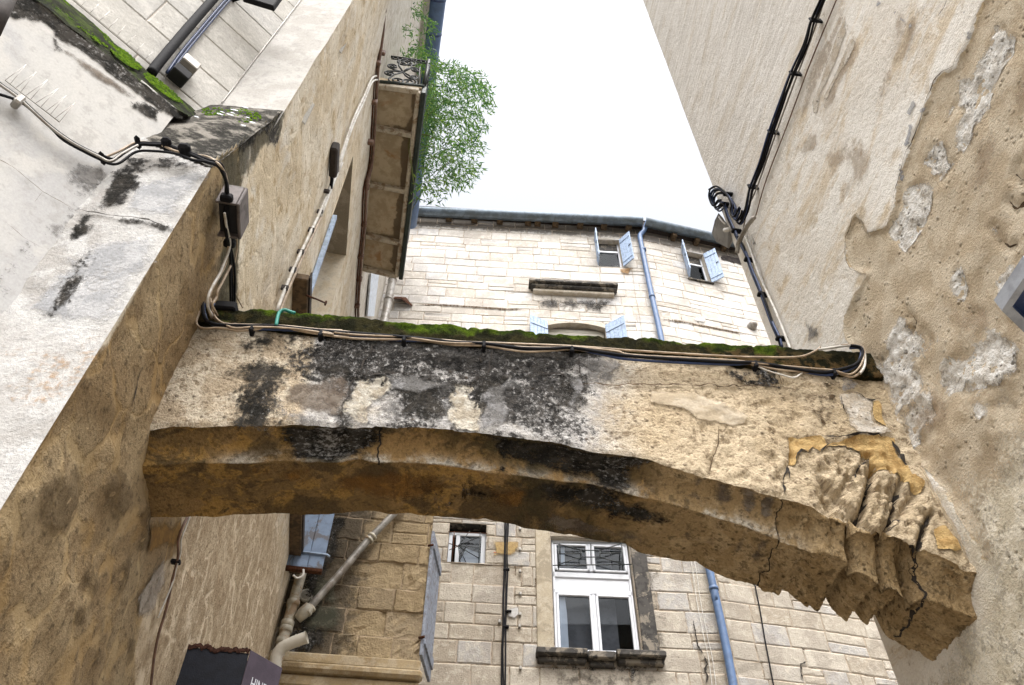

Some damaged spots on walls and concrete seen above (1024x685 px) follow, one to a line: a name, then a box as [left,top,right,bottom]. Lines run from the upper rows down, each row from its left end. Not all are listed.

water stain [52,157,205,239]
water stain [28,240,150,320]
flaking render [788,0,1024,560]
water stain [225,334,668,535]
water stain [727,369,780,388]
crack [756,392,908,586]
crack [893,517,929,637]